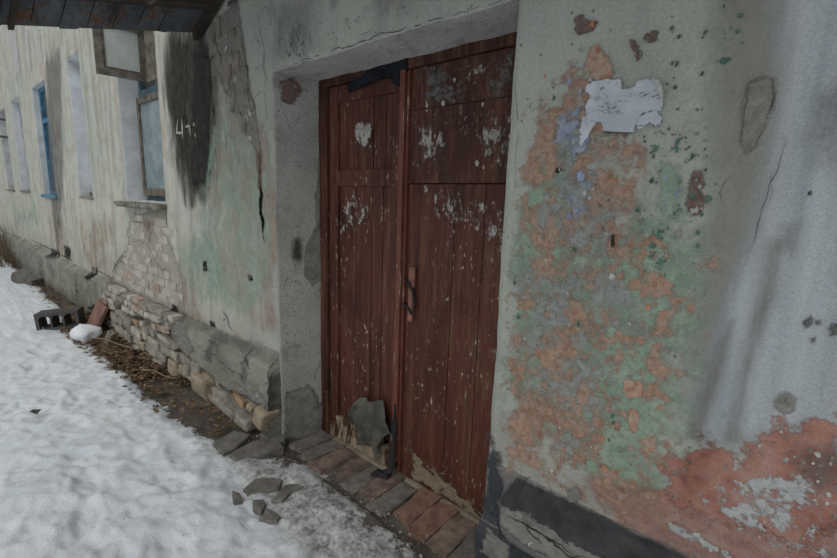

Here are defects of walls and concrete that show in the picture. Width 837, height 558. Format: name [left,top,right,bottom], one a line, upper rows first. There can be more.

spalling [83,225,115,280]
flaking render [102,210,193,338]
water stain [171,44,211,183]
flaking render [205,2,275,310]
crack [258,162,266,243]
peeling [409,44,837,558]
crack [750,136,787,250]
crack [508,476,586,558]